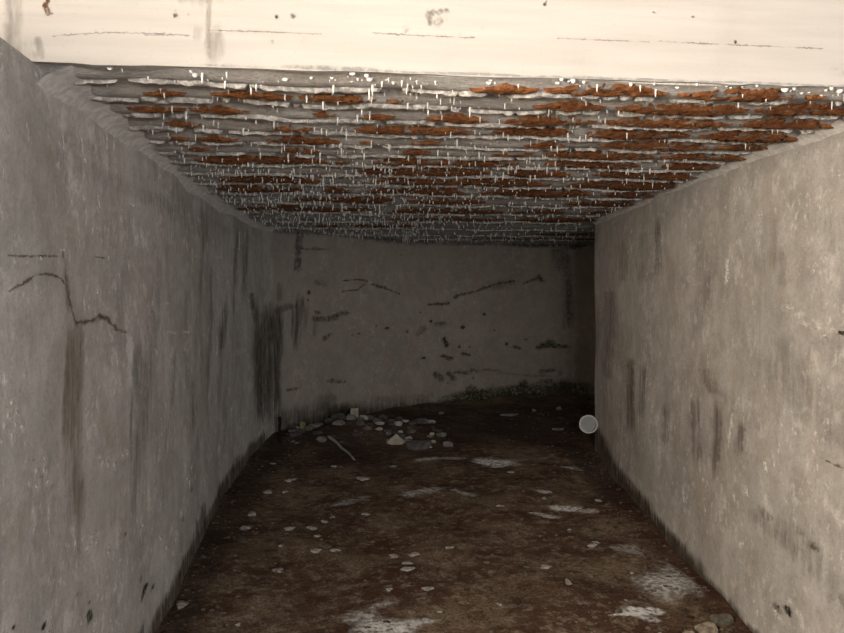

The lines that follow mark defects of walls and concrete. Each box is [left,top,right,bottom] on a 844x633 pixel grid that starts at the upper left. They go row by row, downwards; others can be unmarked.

leakage [73,67,844,267]
crack [9,254,127,333]